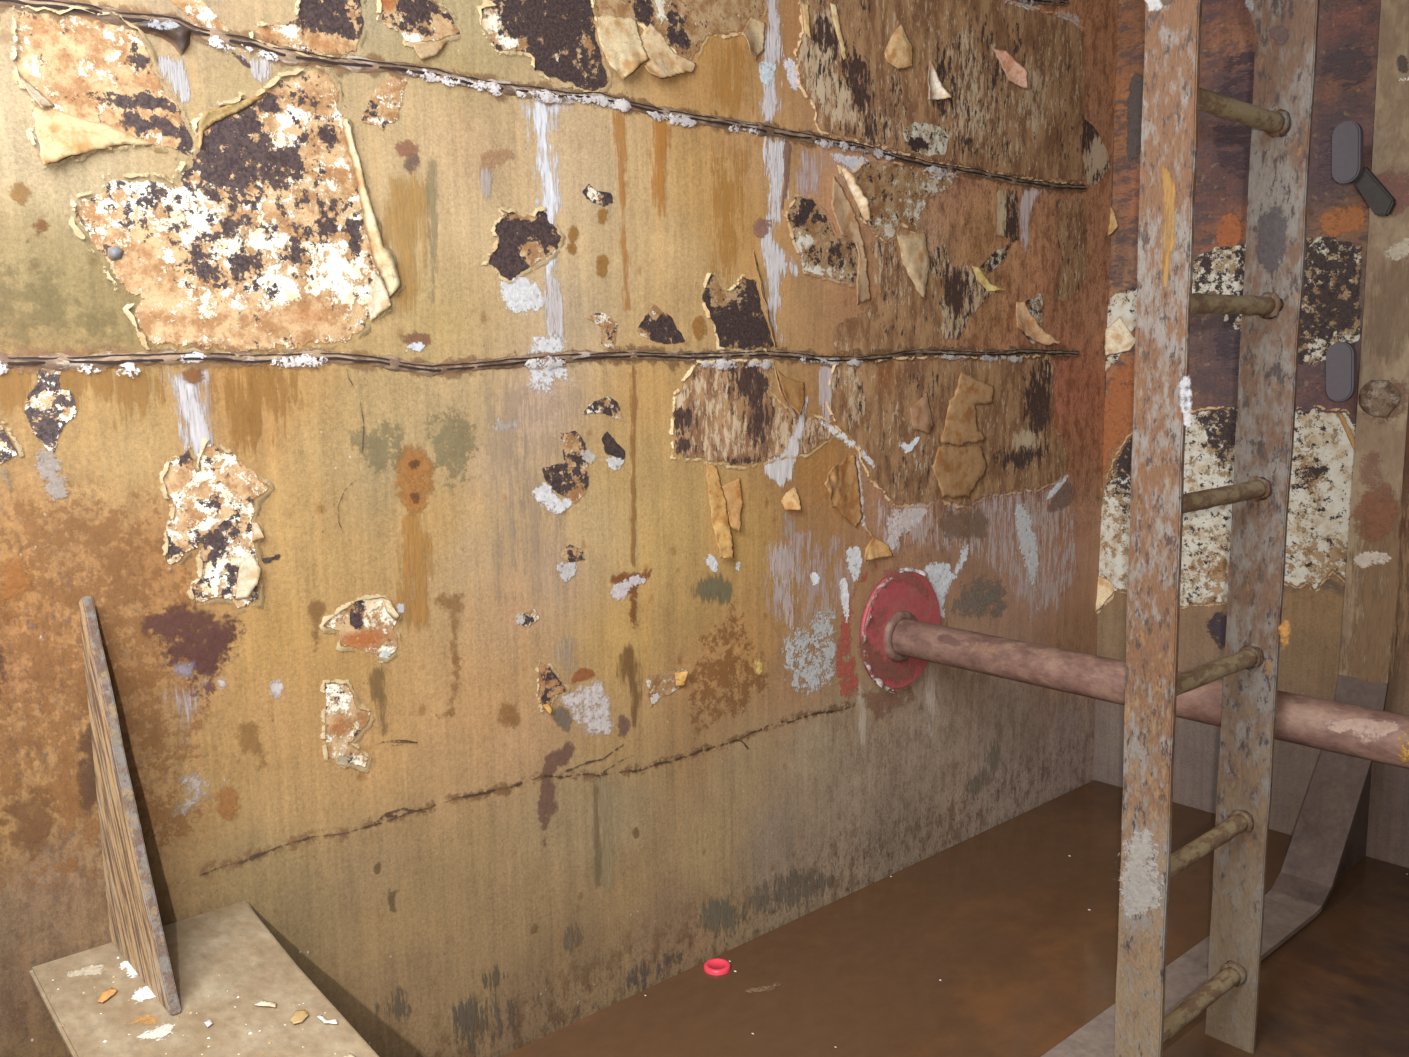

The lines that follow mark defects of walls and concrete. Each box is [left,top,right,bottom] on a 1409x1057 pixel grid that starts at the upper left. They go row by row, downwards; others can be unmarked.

peeling [476,0,767,92]
peeling [10,0,461,357]
damp [407,69,697,224]
damp [728,0,895,342]
damp [500,250,573,395]
peeling [669,0,1110,562]
peeling [159,438,280,613]
rust [394,445,435,626]
damp [764,356,1076,645]
rust [142,604,243,696]
rust [78,725,96,809]
crack [200,701,855,875]